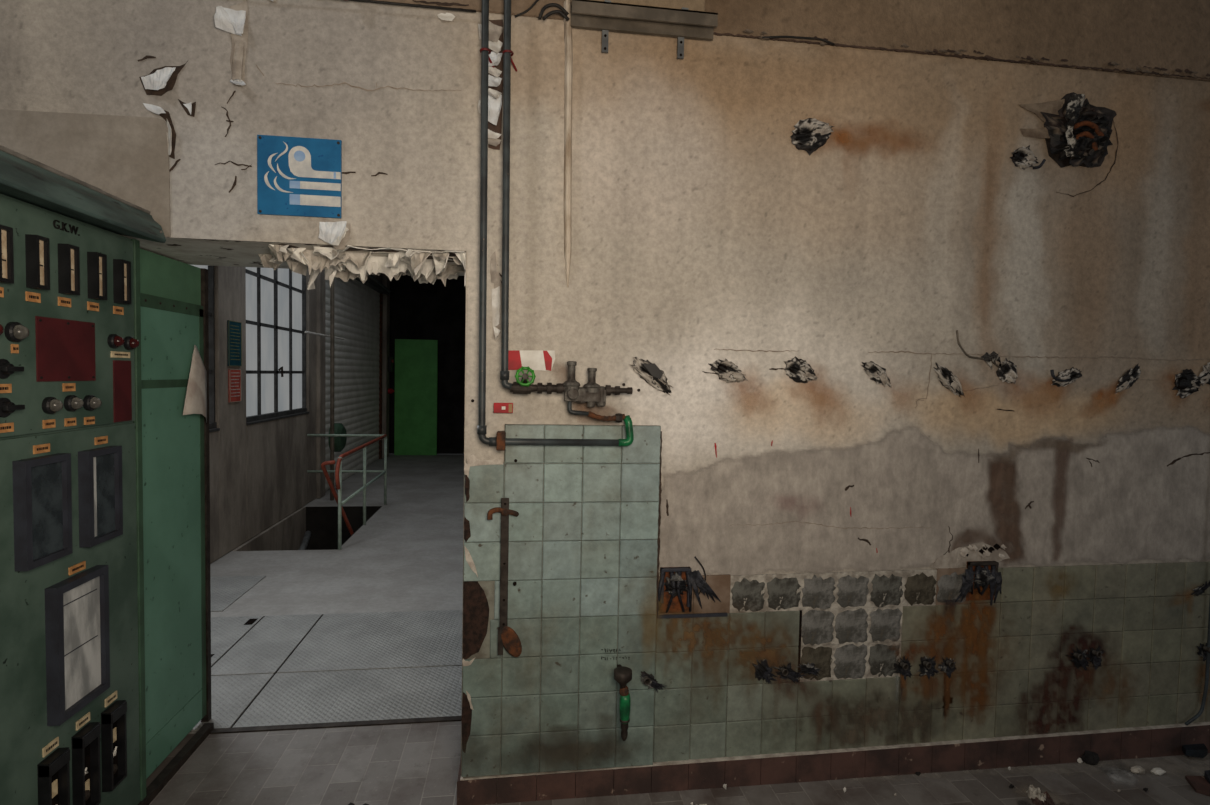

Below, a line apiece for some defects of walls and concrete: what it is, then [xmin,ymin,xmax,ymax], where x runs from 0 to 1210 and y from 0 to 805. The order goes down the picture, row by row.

peeling [214,0,248,88]
crack [215,91,252,193]
crack [256,65,456,91]
peeling [478,19,504,150]
hole [1010,92,1117,170]
flaking render [258,217,466,290]
spalling [462,517,489,666]
corrosion [666,613,790,672]
peeling [659,426,1210,697]
damp [953,460,1023,562]
damp [1036,441,1085,559]
crack [1167,452,1210,467]